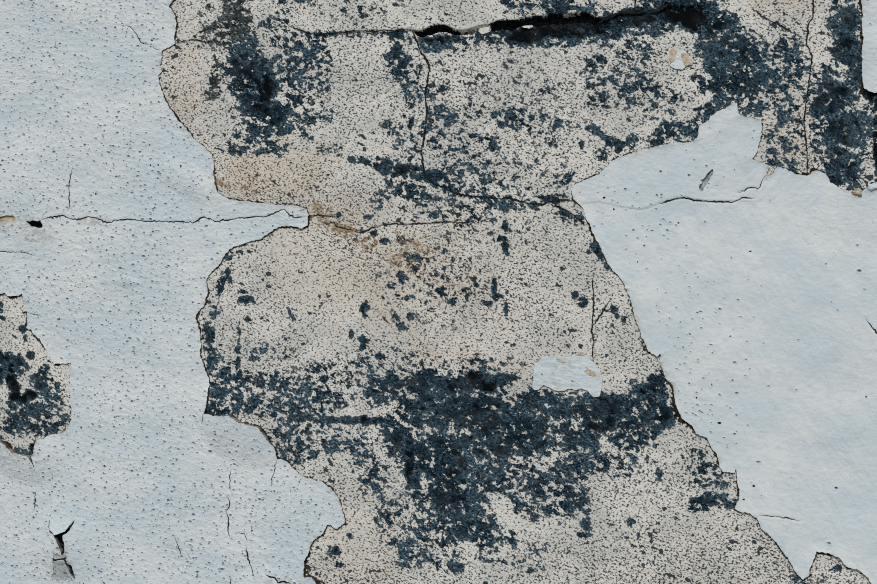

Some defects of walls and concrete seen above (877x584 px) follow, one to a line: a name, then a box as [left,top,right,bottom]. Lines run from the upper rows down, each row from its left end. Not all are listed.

crack [491,0,670,32]
peeling [563,0,658,19]
crack [42,170,469,232]
crack [286,24,585,225]
damp [195,0,877,256]
crack [660,176,765,204]
peeling [706,0,877,192]
damp [359,230,509,331]
damp [0,325,71,455]
peeling [0,293,72,457]
damp [201,250,676,577]
peeling [454,444,493,494]